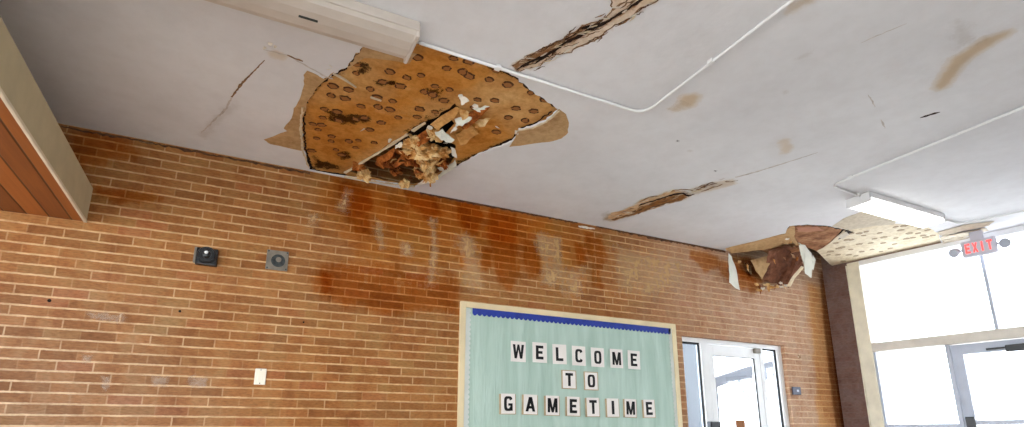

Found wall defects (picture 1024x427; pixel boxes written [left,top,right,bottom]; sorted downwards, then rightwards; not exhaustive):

crack [512,0,658,72]
crack [61,42,333,174]
spalling [264,44,569,189]
crack [419,152,818,253]
peeling [817,212,994,266]